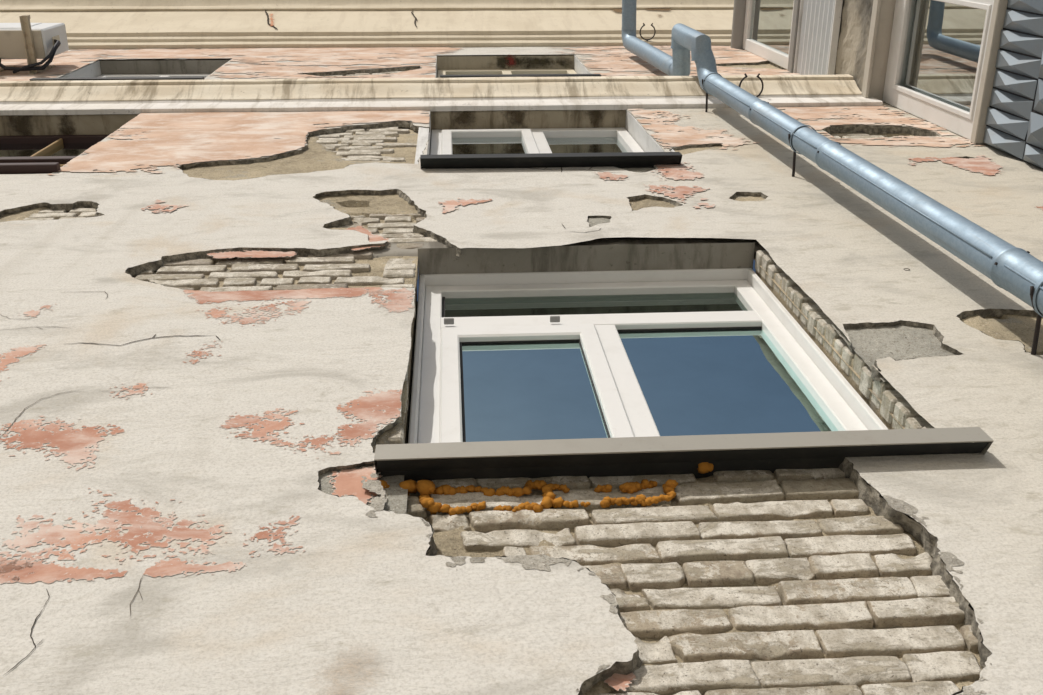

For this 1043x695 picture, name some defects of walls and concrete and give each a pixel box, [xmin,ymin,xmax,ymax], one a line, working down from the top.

peeling [48,110,430,180]
spalling [0,201,104,222]
peeling [438,198,492,213]
spalling [125,189,461,326]
spalling [832,320,963,382]
spalling [956,308,1043,355]
peeling [109,382,152,400]
peeling [0,416,125,471]
peeling [0,488,305,584]
spalling [220,381,992,695]